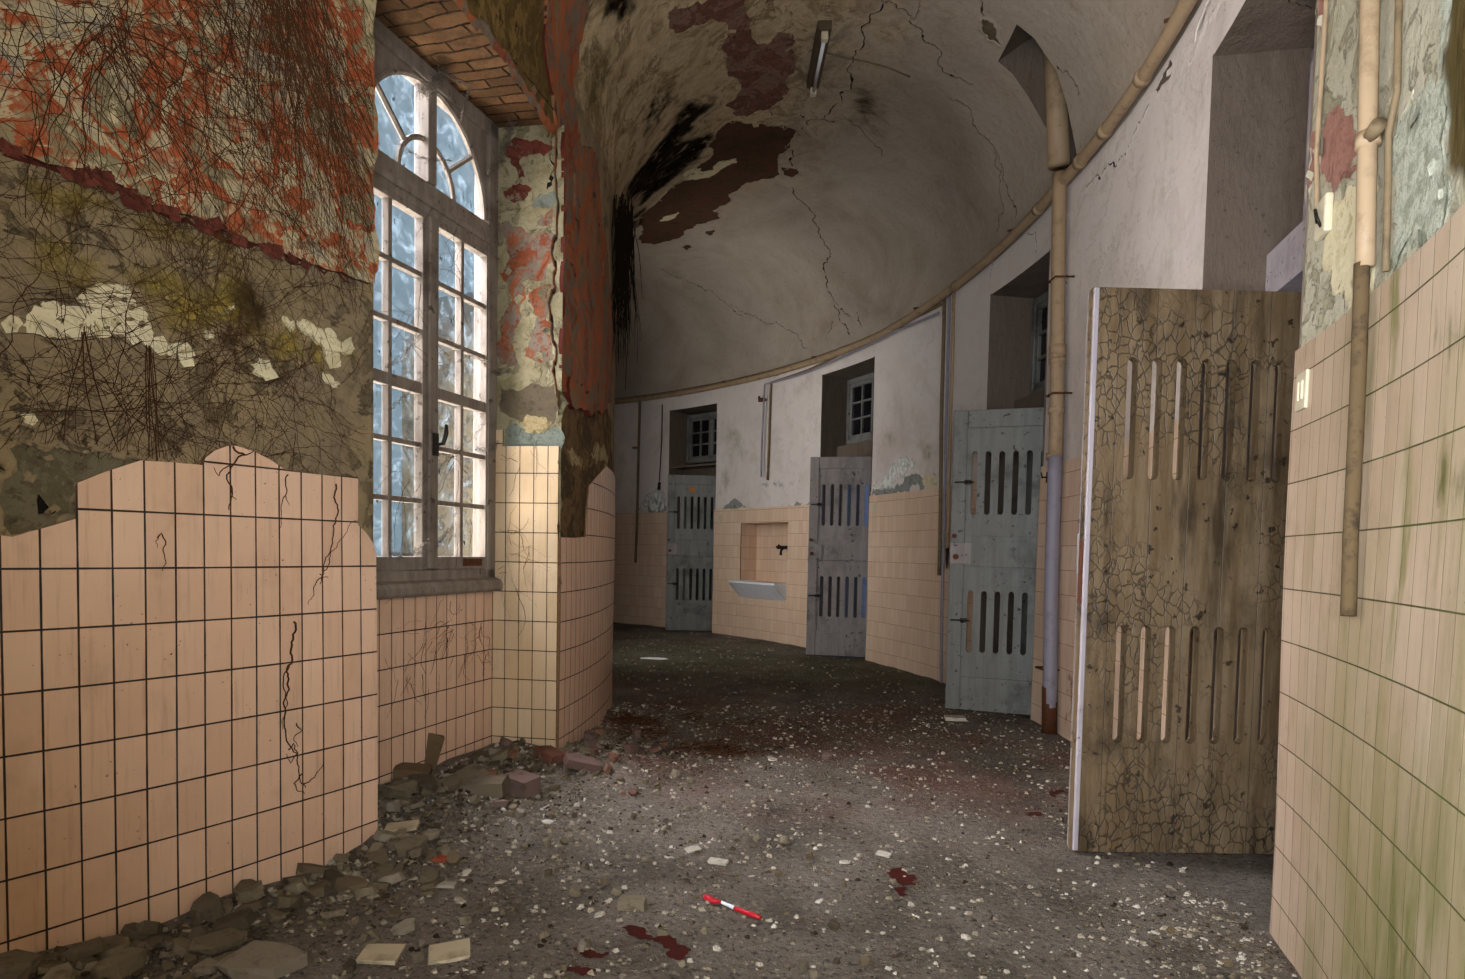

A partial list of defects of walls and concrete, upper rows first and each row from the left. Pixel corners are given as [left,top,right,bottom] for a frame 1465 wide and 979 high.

flaking render [0,0,380,284]
water stain [627,90,713,228]
flaking render [635,0,801,251]
crack [661,0,1018,350]
water stain [1312,0,1360,142]
water stain [1370,0,1465,291]
peeling [22,295,145,340]
peeling [177,348,195,367]
peeling [251,360,278,381]
peeling [325,337,355,369]
flaking render [454,0,613,538]
water stain [1301,179,1356,347]